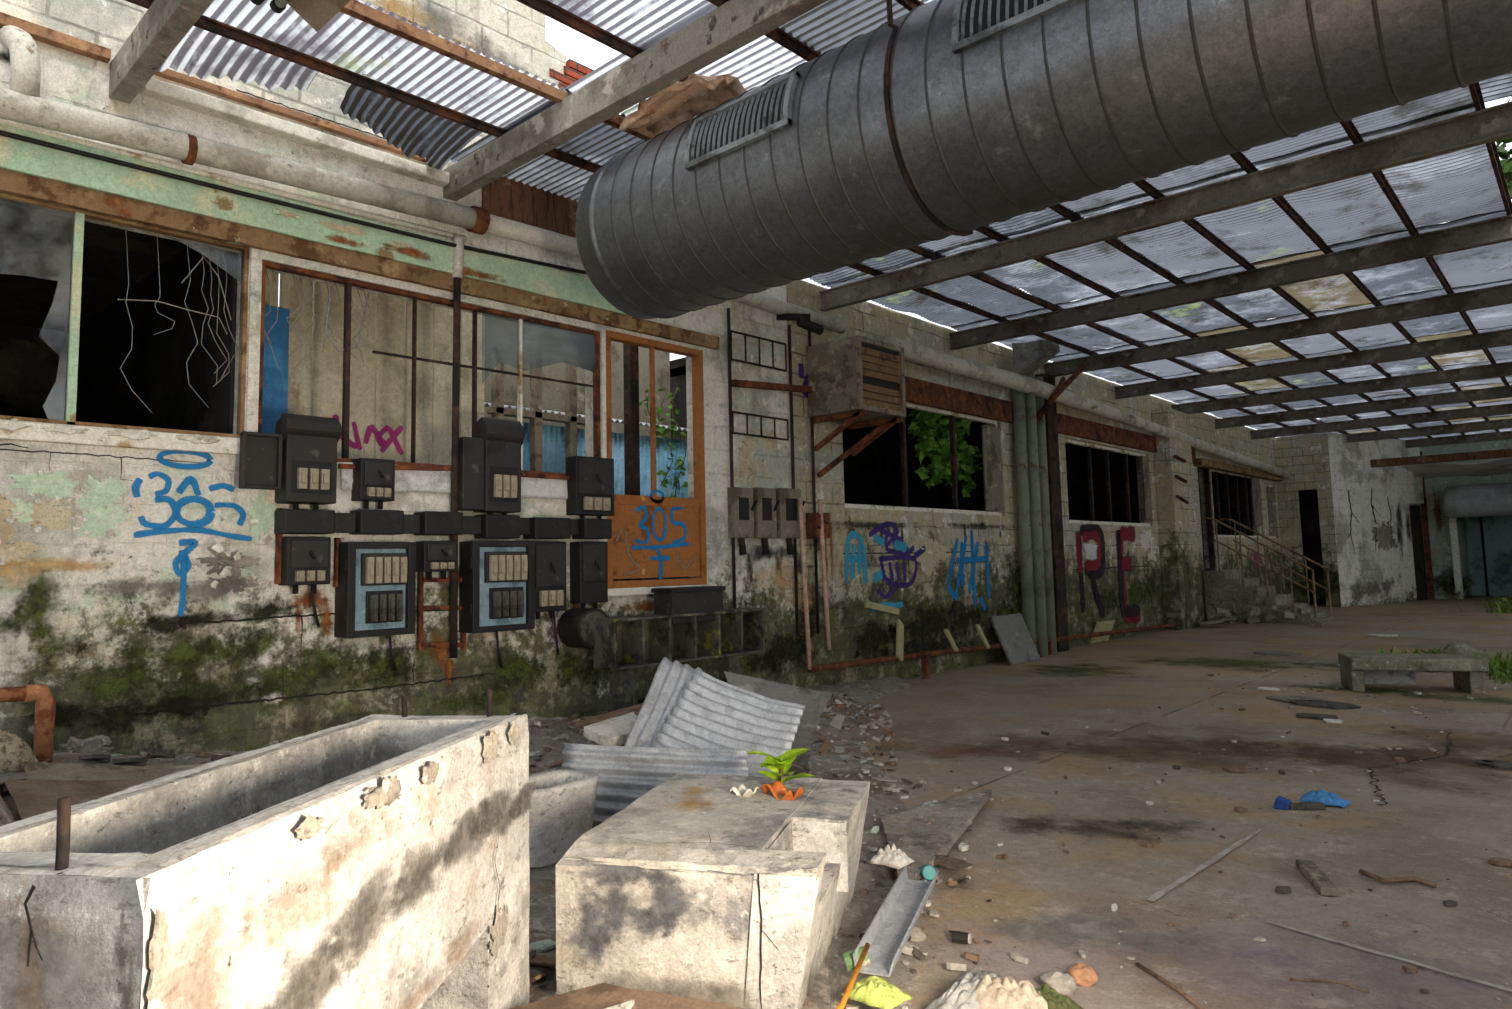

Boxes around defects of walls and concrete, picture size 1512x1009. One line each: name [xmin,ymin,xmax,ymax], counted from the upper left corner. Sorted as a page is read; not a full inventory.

peeling [1372,520,1398,551]
damp [108,579,297,634]
damp [249,652,282,703]
damp [55,689,224,734]
damp [607,788,742,845]
damp [264,782,536,1009]
damp [566,865,695,963]
damp [613,979,750,1009]